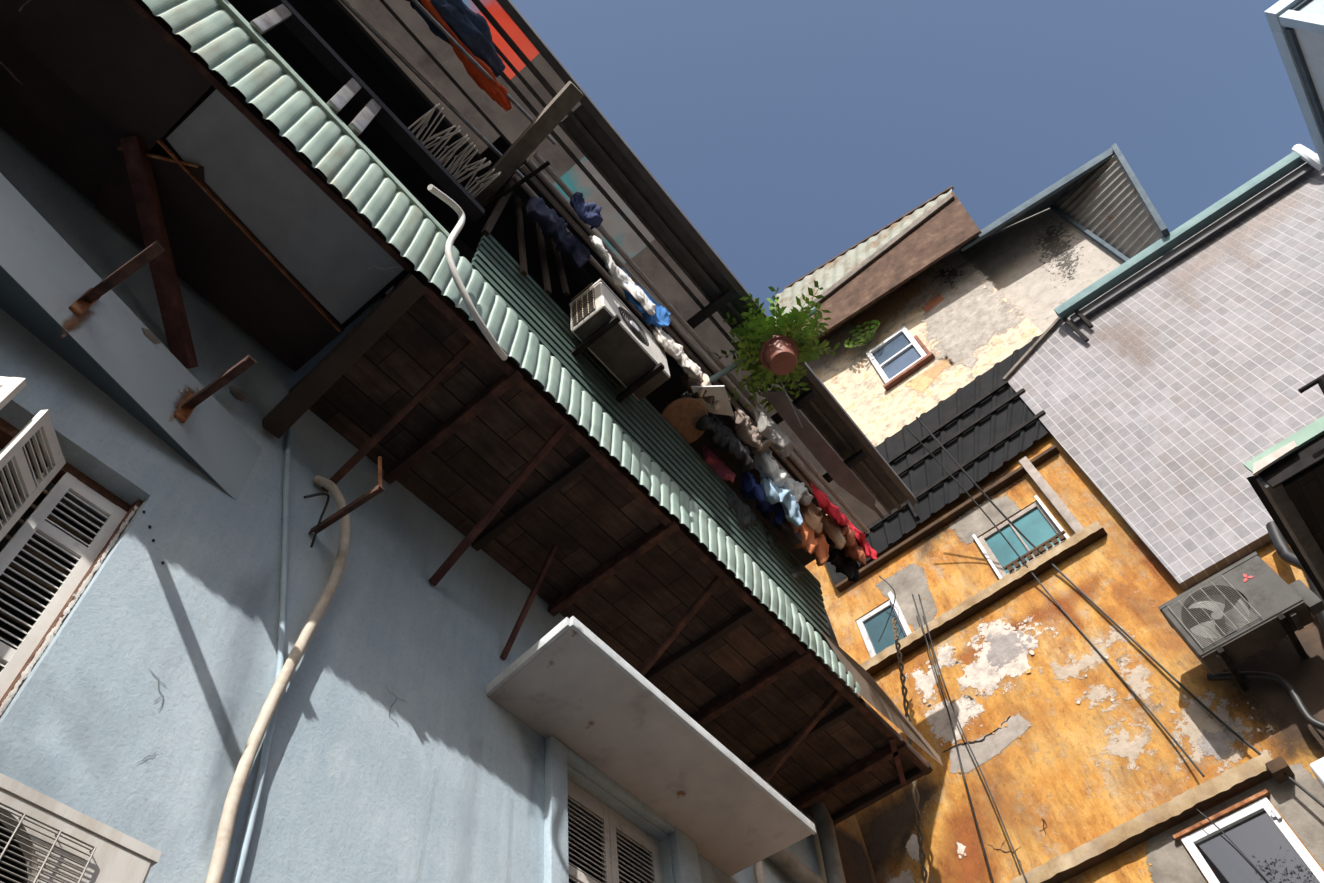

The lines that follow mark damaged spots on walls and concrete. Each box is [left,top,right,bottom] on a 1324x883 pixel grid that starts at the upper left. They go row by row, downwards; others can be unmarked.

water stain [1028,215,1083,281]
corrosion [63,310,91,337]
peeling [850,251,1025,392]
peeling [902,616,1281,781]
peeling [887,834,921,883]